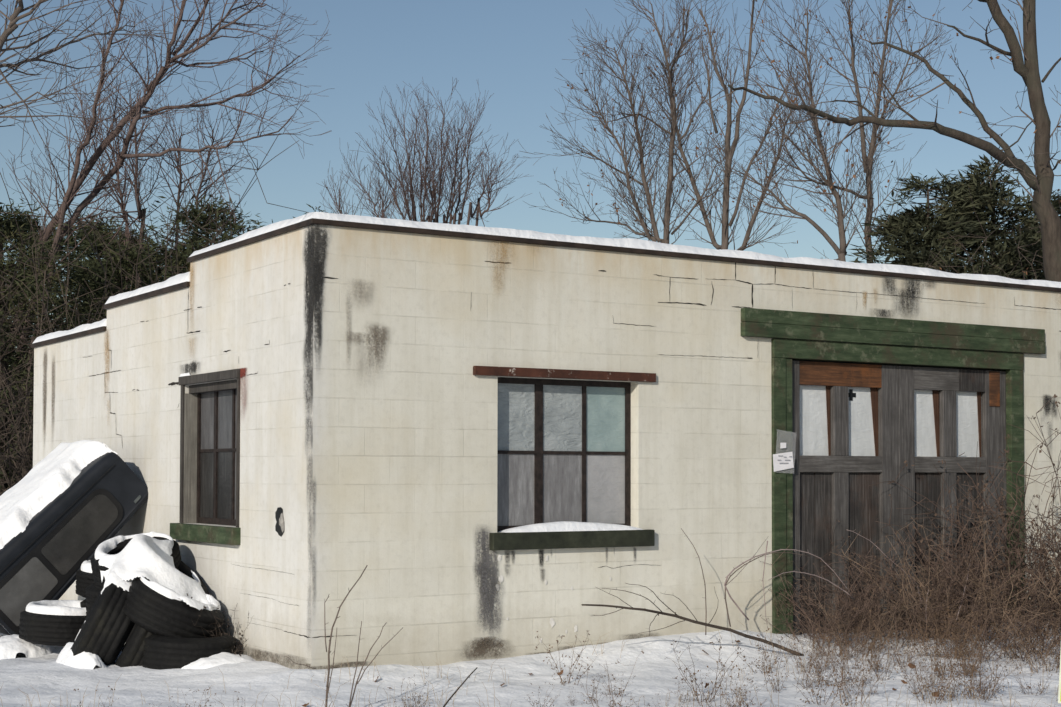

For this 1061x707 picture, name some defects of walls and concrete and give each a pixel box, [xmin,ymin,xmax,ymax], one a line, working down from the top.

leakage [304,224,327,407]
leakage [43,354,55,420]
crack [83,350,139,435]
spalling [275,507,284,536]
leakage [475,529,515,623]
leakage [465,637,504,658]